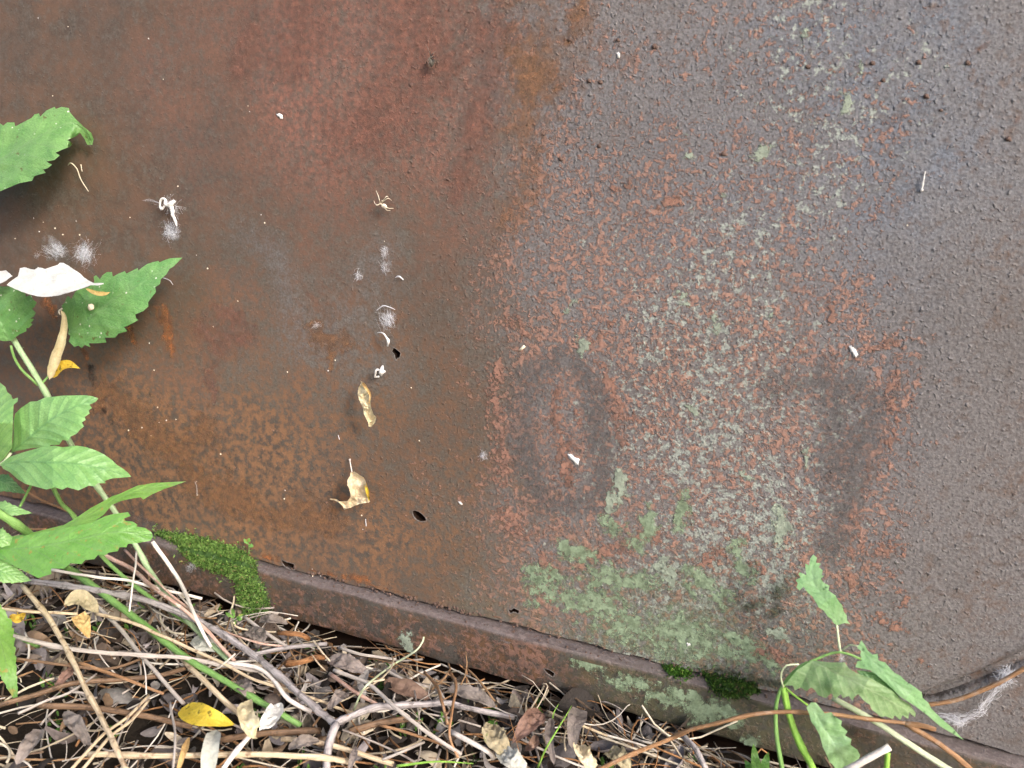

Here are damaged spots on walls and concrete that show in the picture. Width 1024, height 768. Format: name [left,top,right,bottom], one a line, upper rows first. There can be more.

rust [476,351,664,574]
leakage [521,489,787,687]